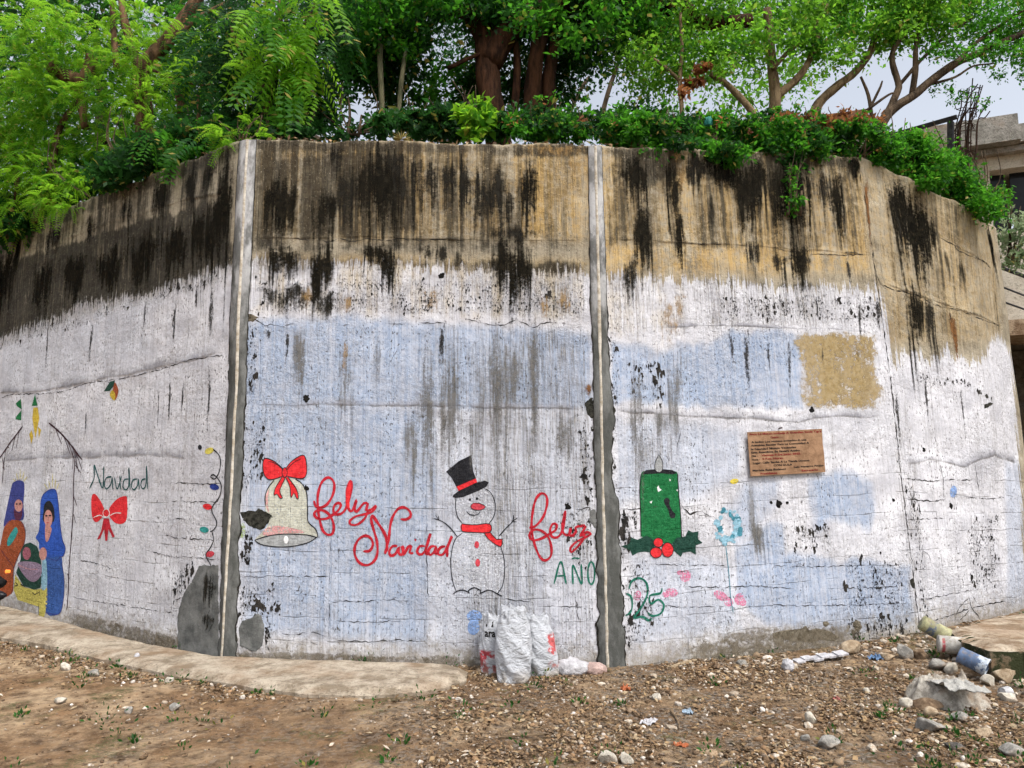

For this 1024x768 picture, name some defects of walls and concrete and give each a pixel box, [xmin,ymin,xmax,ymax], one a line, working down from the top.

water stain [0,240,21,312]
crack [1,355,222,398]
water stain [31,158,233,367]
water stain [263,141,537,323]
water stain [614,153,860,299]
water stain [728,329,750,388]
water stain [787,305,883,409]
water stain [887,179,966,427]